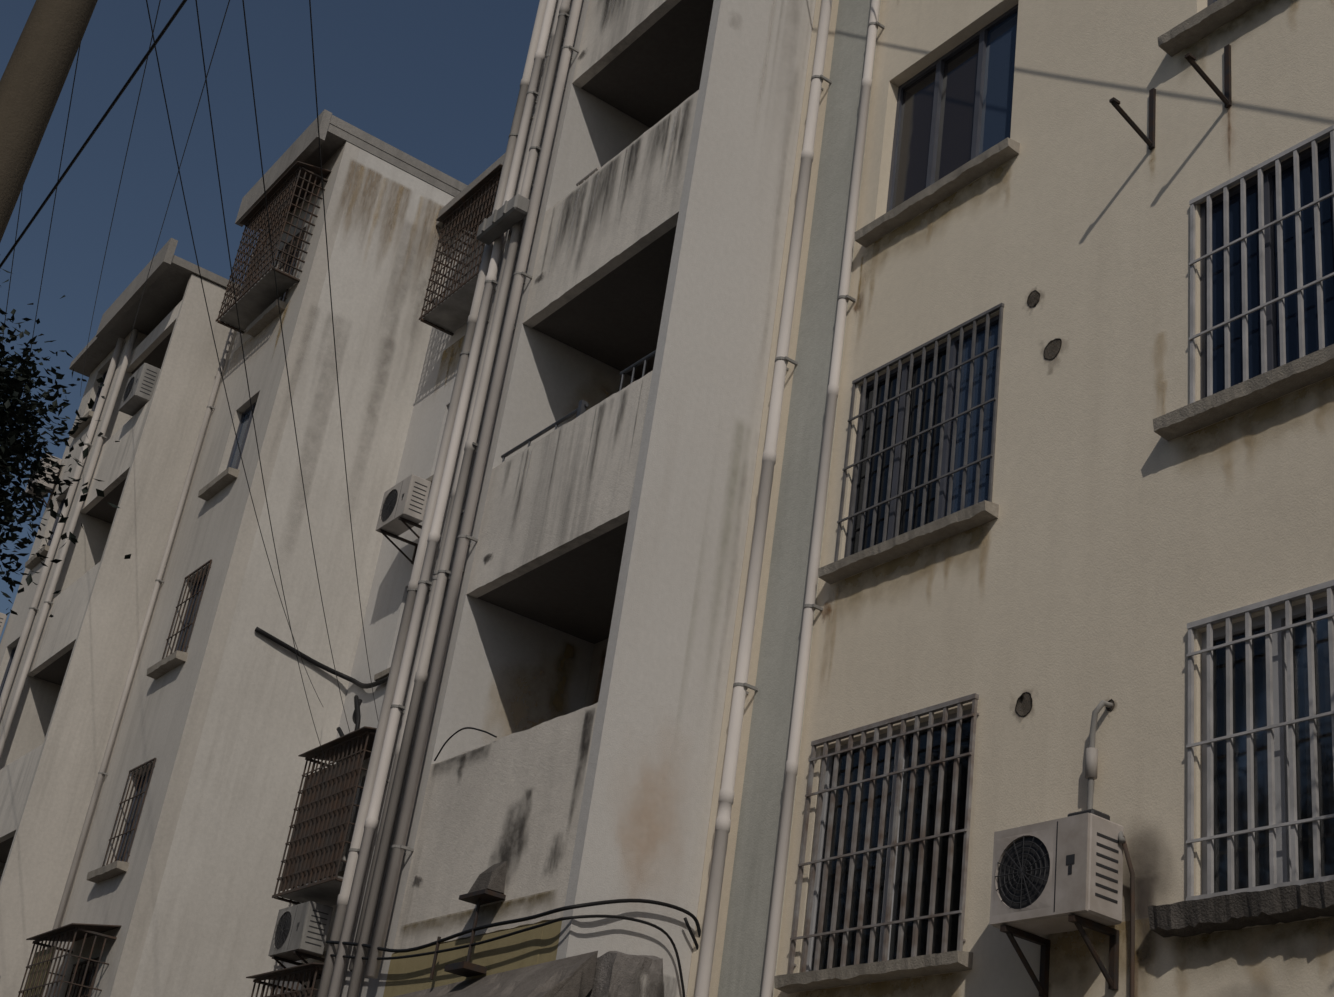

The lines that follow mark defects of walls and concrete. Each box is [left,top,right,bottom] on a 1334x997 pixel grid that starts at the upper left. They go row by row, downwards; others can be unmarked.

damp [343,162,409,230]
damp [582,712,593,756]